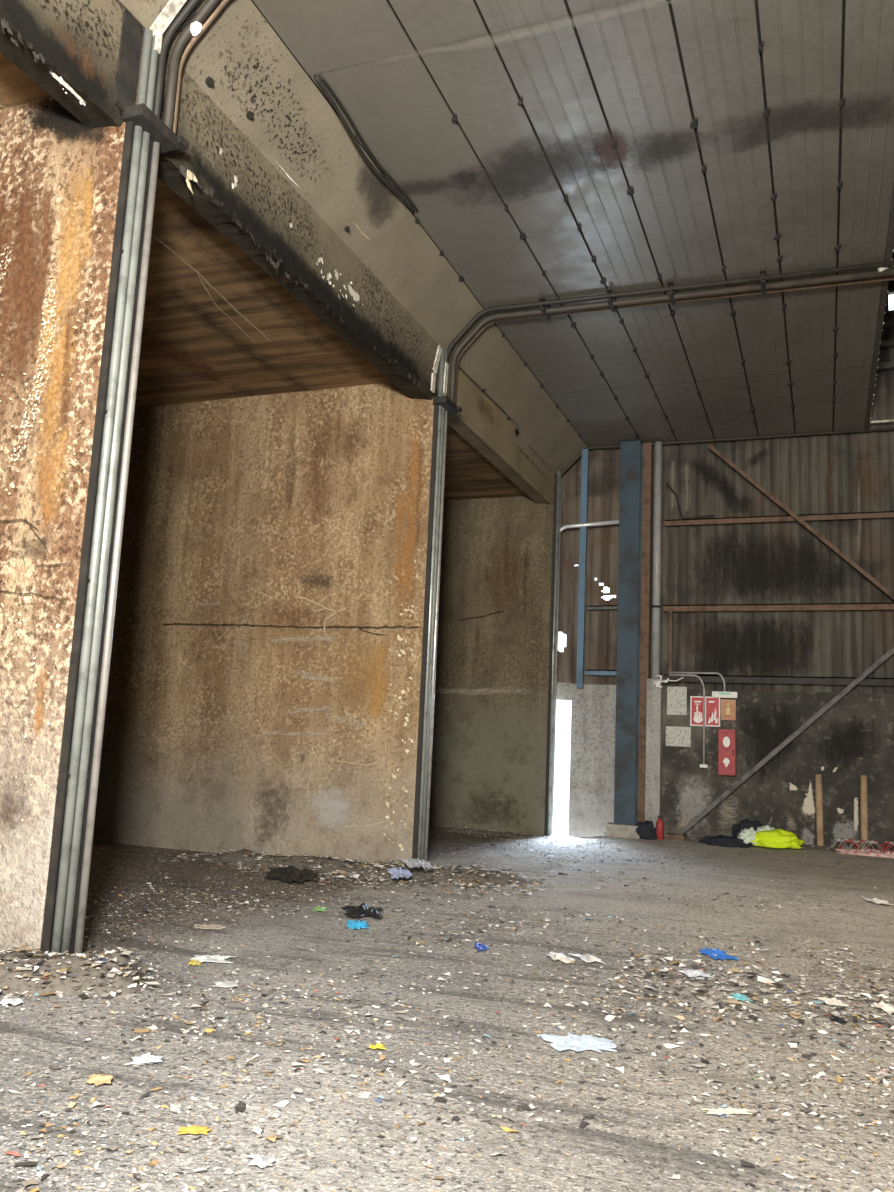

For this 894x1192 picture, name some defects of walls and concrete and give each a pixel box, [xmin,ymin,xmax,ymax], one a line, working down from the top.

leakage [41,0,112,57]
leakage [181,99,327,259]
leakage [220,52,328,180]
leakage [362,143,599,219]
leakage [641,134,692,162]
leakage [741,101,887,147]
spalling [180,165,363,324]
rust [0,175,93,520]
crack [0,519,68,599]
crack [162,595,419,635]
rust [35,686,43,733]